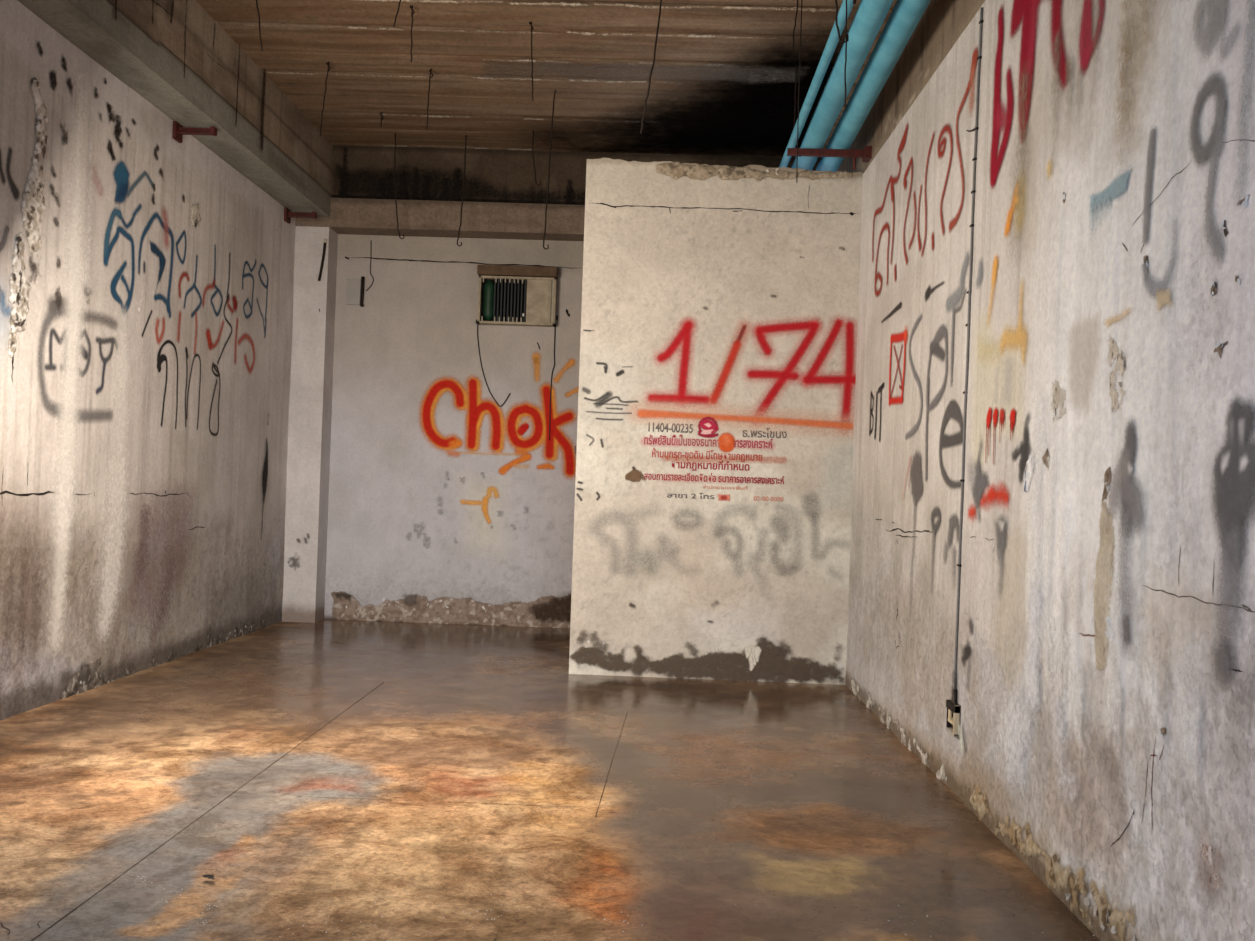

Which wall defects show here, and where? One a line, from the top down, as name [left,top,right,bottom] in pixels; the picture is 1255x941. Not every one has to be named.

water stain [474,59,799,84]
peeling [8,79,49,383]
crack [0,473,95,498]
crack [125,489,184,497]
peeling [1094,467,1114,670]
crack [1142,555,1255,612]
flaking render [331,592,571,628]
flaking render [61,659,137,699]
flaking render [970,786,1136,941]